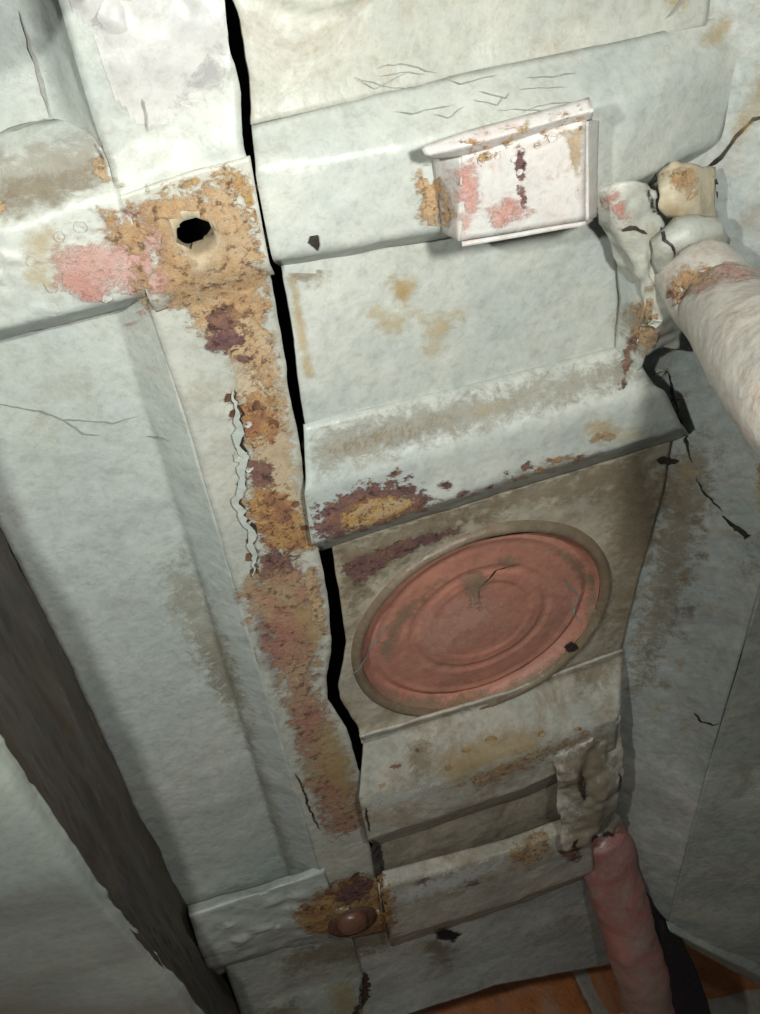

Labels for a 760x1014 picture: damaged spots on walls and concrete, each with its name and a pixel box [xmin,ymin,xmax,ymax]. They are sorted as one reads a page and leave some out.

crack [355,63,573,118]
corrosion [85,144,125,188]
corrosion [412,163,457,229]
corrosion [601,191,630,223]
corrosion [661,167,699,200]
corrosion [121,163,293,435]
corrosion [617,261,760,390]
corrosion [504,454,601,482]
crack [656,371,750,540]
corrosion [309,467,494,542]
corrosion [287,828,583,939]
crack [352,972,371,1014]